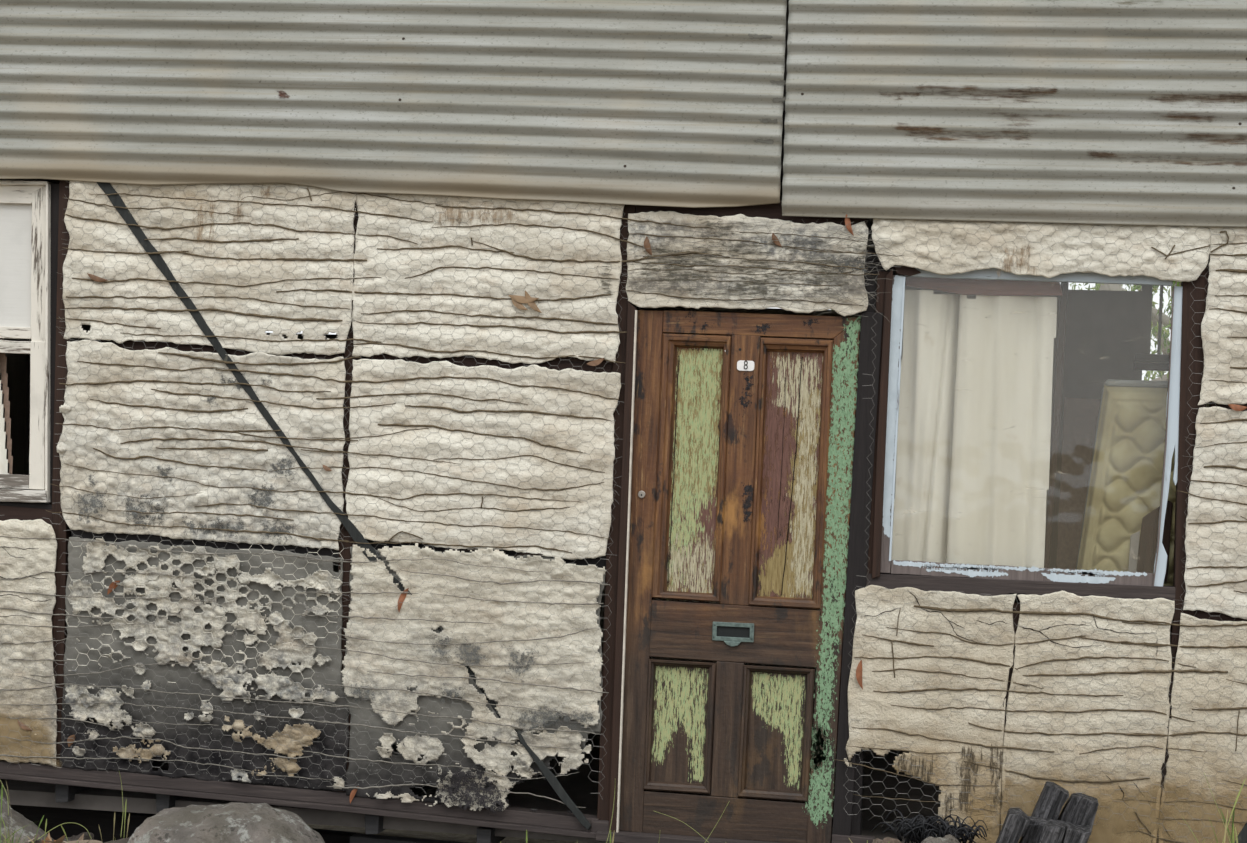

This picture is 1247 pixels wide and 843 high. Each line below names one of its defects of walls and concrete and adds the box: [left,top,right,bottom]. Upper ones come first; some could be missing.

corrosion [896,127,989,140]
corrosion [881,85,1056,100]
corrosion [1154,94,1247,119]
corrosion [1189,134,1247,144]
crack [349,201,357,317]
mould [74,475,168,529]
mould [182,456,296,544]
peeling [662,347,730,603]
peeling [63,538,605,811]
peeling [651,666,708,783]
crack [866,593,1192,843]